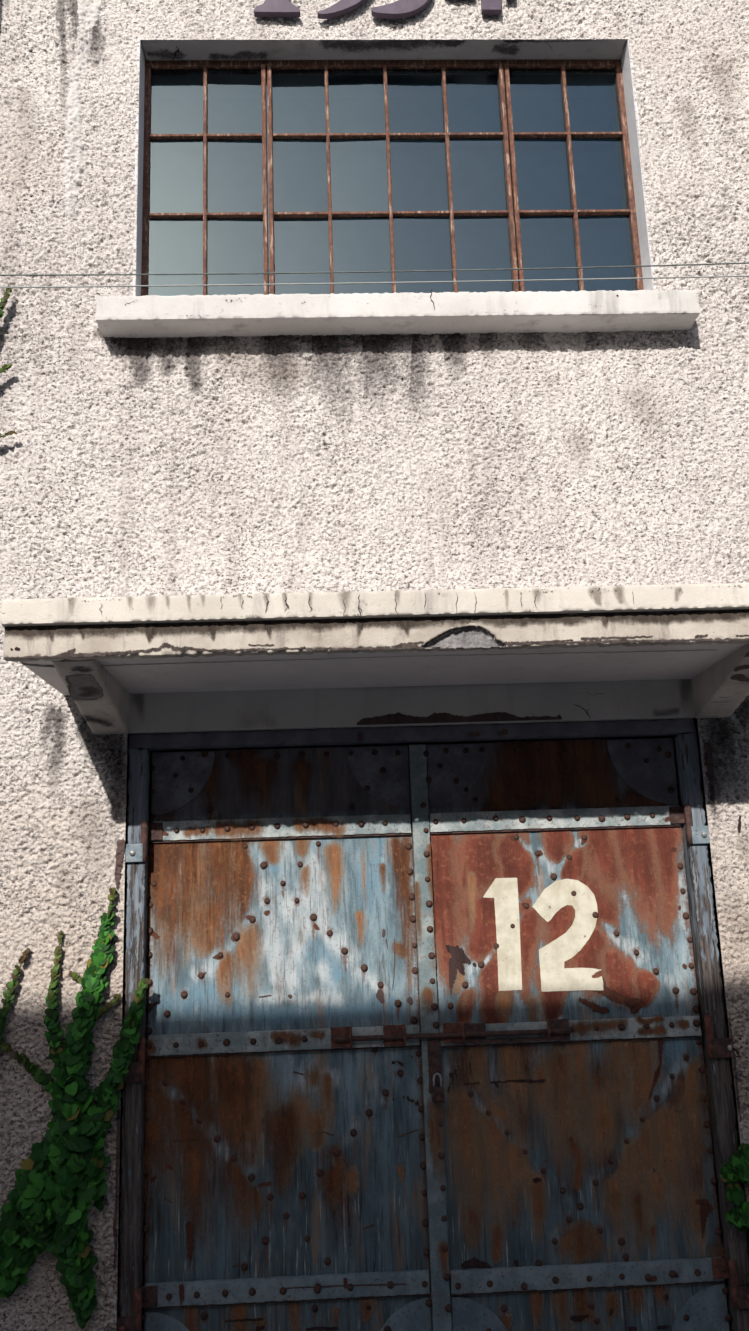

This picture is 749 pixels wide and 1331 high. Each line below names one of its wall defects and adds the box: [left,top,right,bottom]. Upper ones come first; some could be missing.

damp [59,0,101,65]
damp [98,329,234,389]
damp [263,333,491,397]
flaking render [5,626,749,682]
spalling [65,675,104,700]
peeling [357,712,562,725]
rust [147,815,345,999]
rust [376,739,689,1100]
rust [198,1038,334,1171]
rust [439,1206,519,1274]
rust [286,1278,406,1331]
rust [530,1272,679,1331]